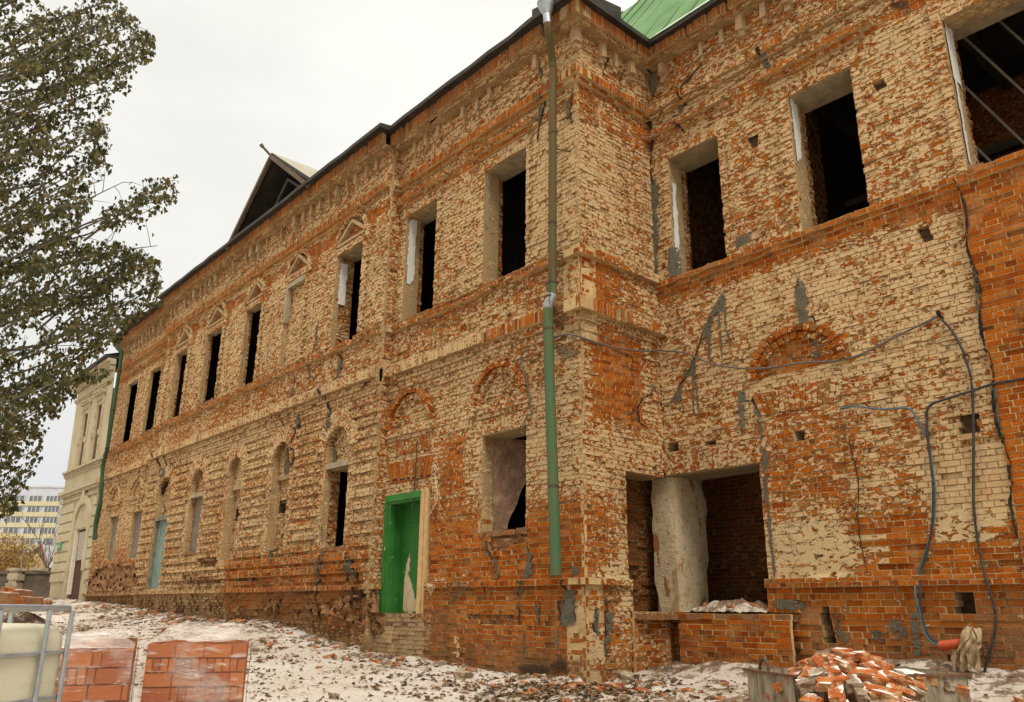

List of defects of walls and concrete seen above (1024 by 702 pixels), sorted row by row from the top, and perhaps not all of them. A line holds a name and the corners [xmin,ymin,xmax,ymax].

flaking render [790,98,802,161]
flaking render [945,23,972,166]
flaking render [337,263,348,306]
flaking render [407,219,418,284]
flaking render [672,182,680,268]
spalling [919,228,934,242]
crack [637,293,730,432]
crack [952,179,1020,543]
crack [268,325,342,563]
flaking render [772,520,864,582]
flaking render [934,504,1005,544]
spalling [403,554,516,626]